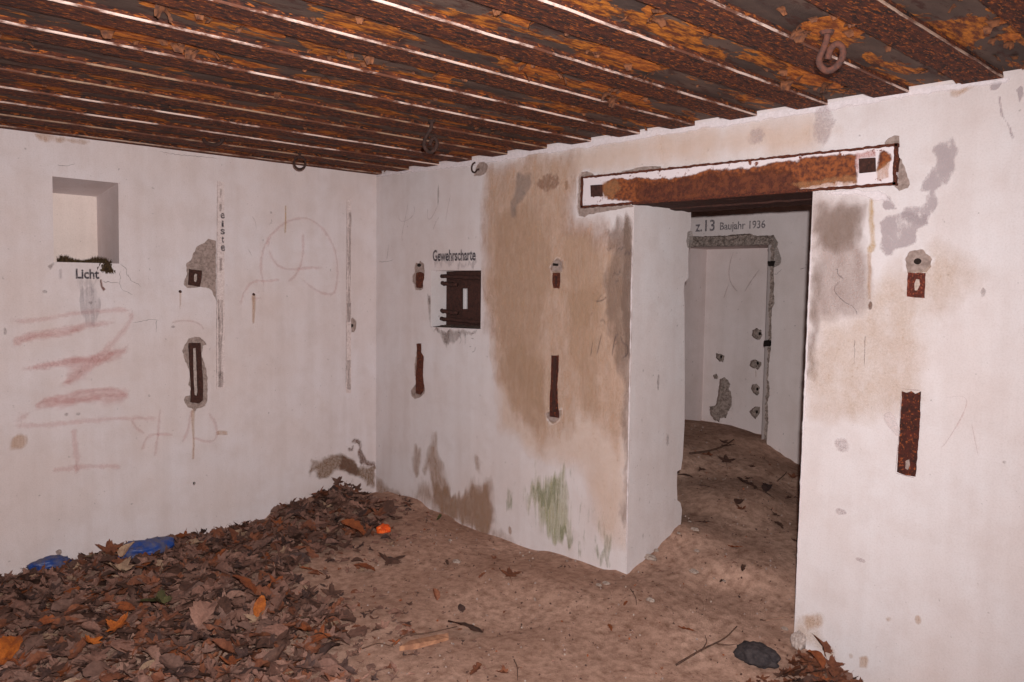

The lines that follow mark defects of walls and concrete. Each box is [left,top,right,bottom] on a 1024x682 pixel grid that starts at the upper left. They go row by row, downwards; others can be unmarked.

corrosion [83,22,279,69]
corrosion [492,9,535,28]
corrosion [500,55,660,108]
corrosion [586,45,661,79]
corrosion [763,66,852,100]
corrosion [791,5,864,44]
corrosion [983,17,1024,69]
corrosion [602,151,891,204]
flaking render [894,159,910,191]
flaking render [184,239,216,299]
flaking render [182,337,220,411]
spalling [709,374,732,422]